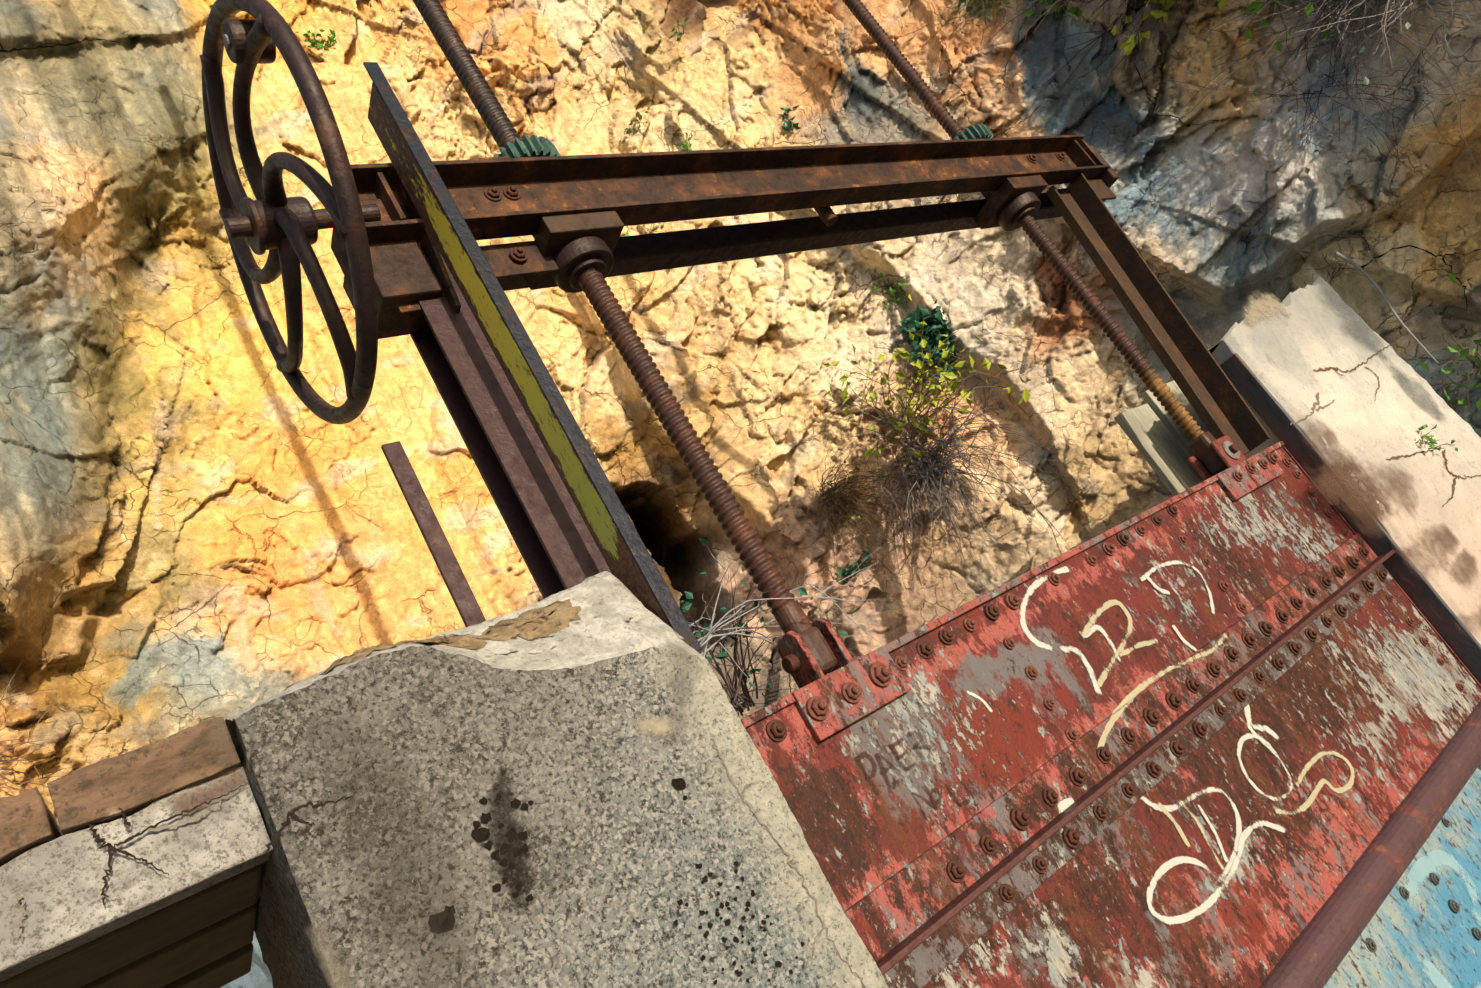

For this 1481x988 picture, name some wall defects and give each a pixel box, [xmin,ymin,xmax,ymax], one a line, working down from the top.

crack [1290,345,1391,425]
corrosion [1320,430,1409,515]
crack [1387,449,1481,506]
crack [89,785,244,905]
leakage [492,770,532,906]